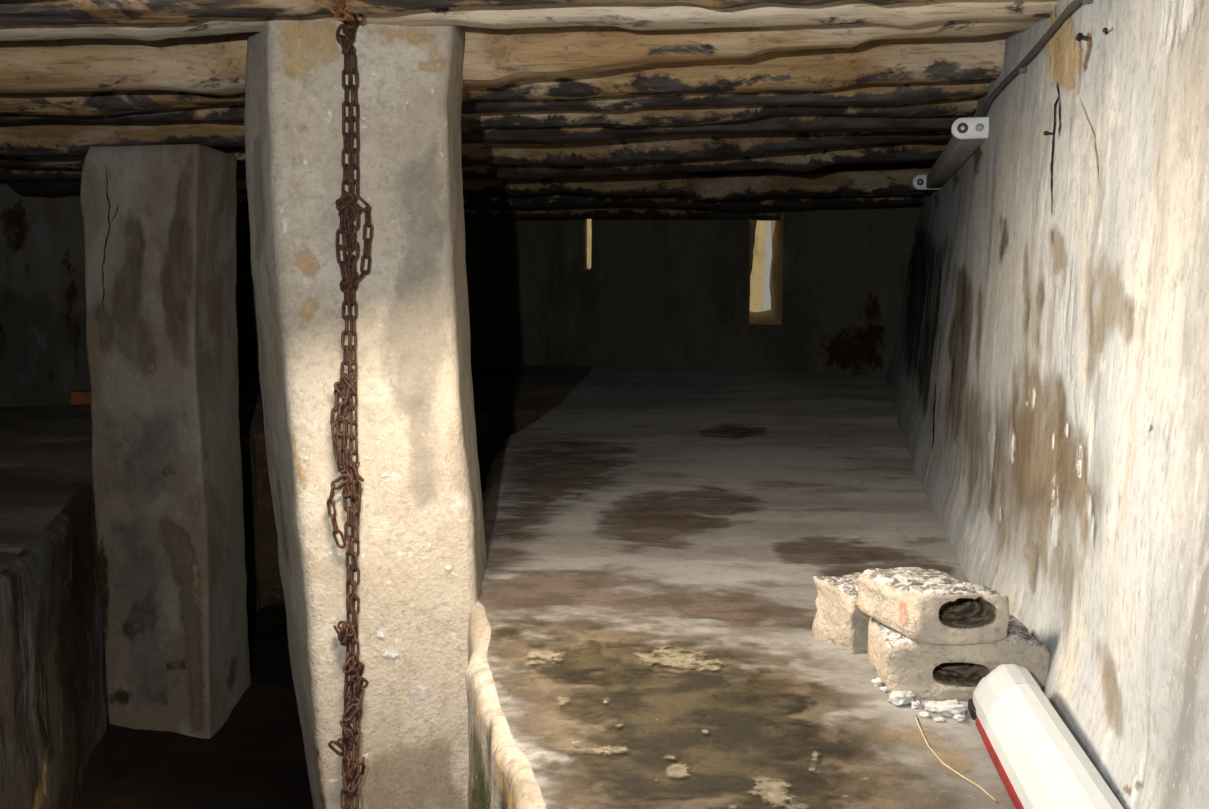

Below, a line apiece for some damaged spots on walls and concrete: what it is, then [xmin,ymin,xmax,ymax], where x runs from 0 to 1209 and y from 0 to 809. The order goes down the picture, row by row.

crack [1050,82,1098,243]
crack [102,166,118,311]
leakage [96,224,153,372]
leakage [163,163,191,360]
corrosion [822,295,884,370]
leakage [1023,233,1130,376]
leakage [697,425,765,439]
leakage [901,220,1098,604]
leakage [478,438,951,809]
leakage [471,720,507,809]